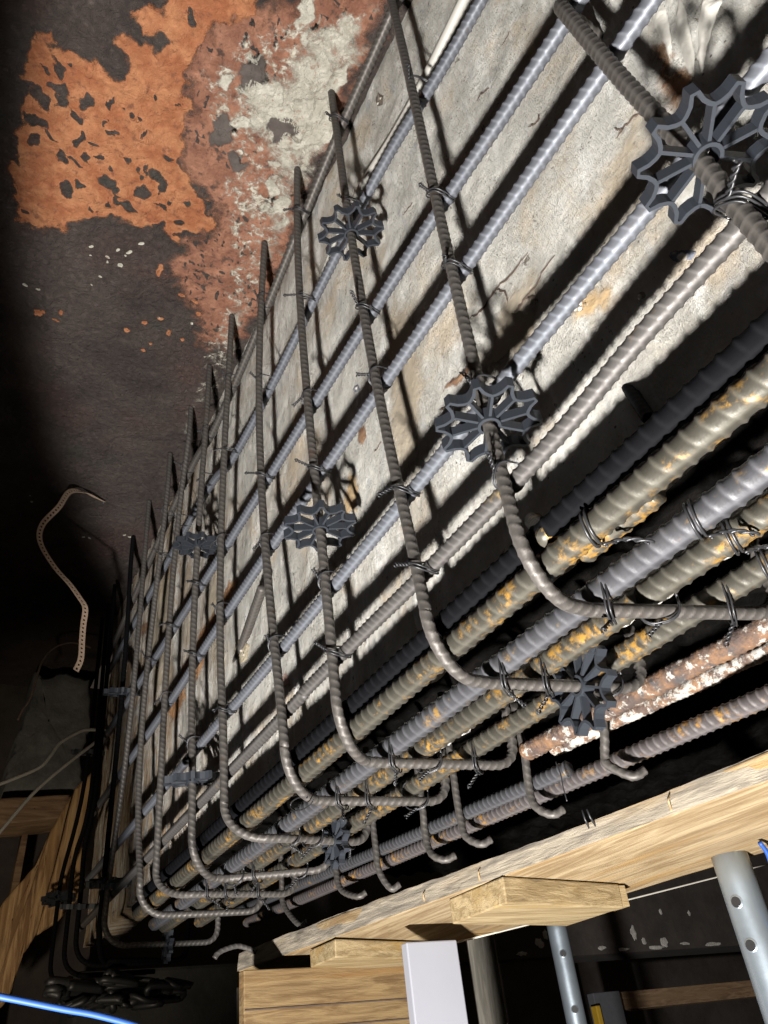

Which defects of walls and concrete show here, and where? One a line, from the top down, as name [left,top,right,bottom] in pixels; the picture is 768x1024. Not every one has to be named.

peeling [7,0,258,243]
spalling [608,0,665,61]
crack [469,252,555,319]
spalling [94,0,609,816]